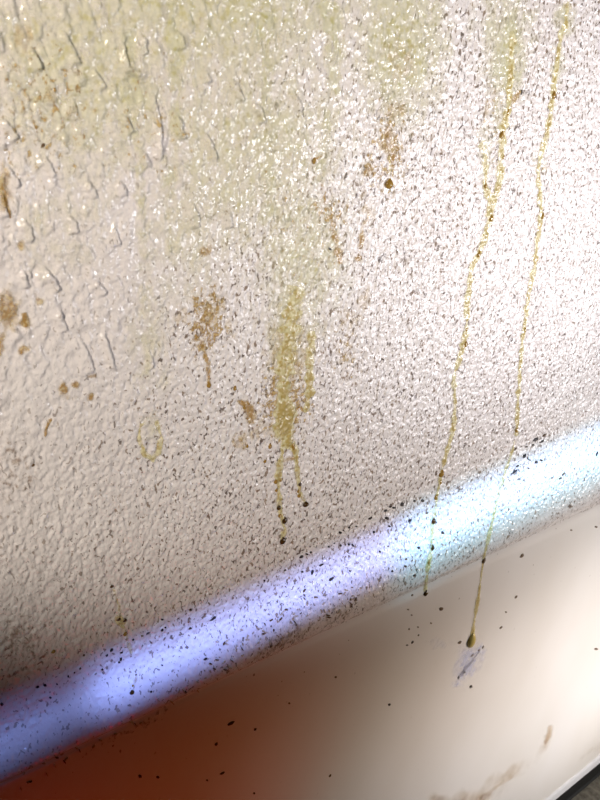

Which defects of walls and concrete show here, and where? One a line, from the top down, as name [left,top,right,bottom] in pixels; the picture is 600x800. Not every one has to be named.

leakage [8,0,341,146]
leakage [364,0,440,198]
corrosion [0,296,30,327]
leakage [258,185,349,545]
leakage [423,13,521,596]
leakage [460,3,569,676]